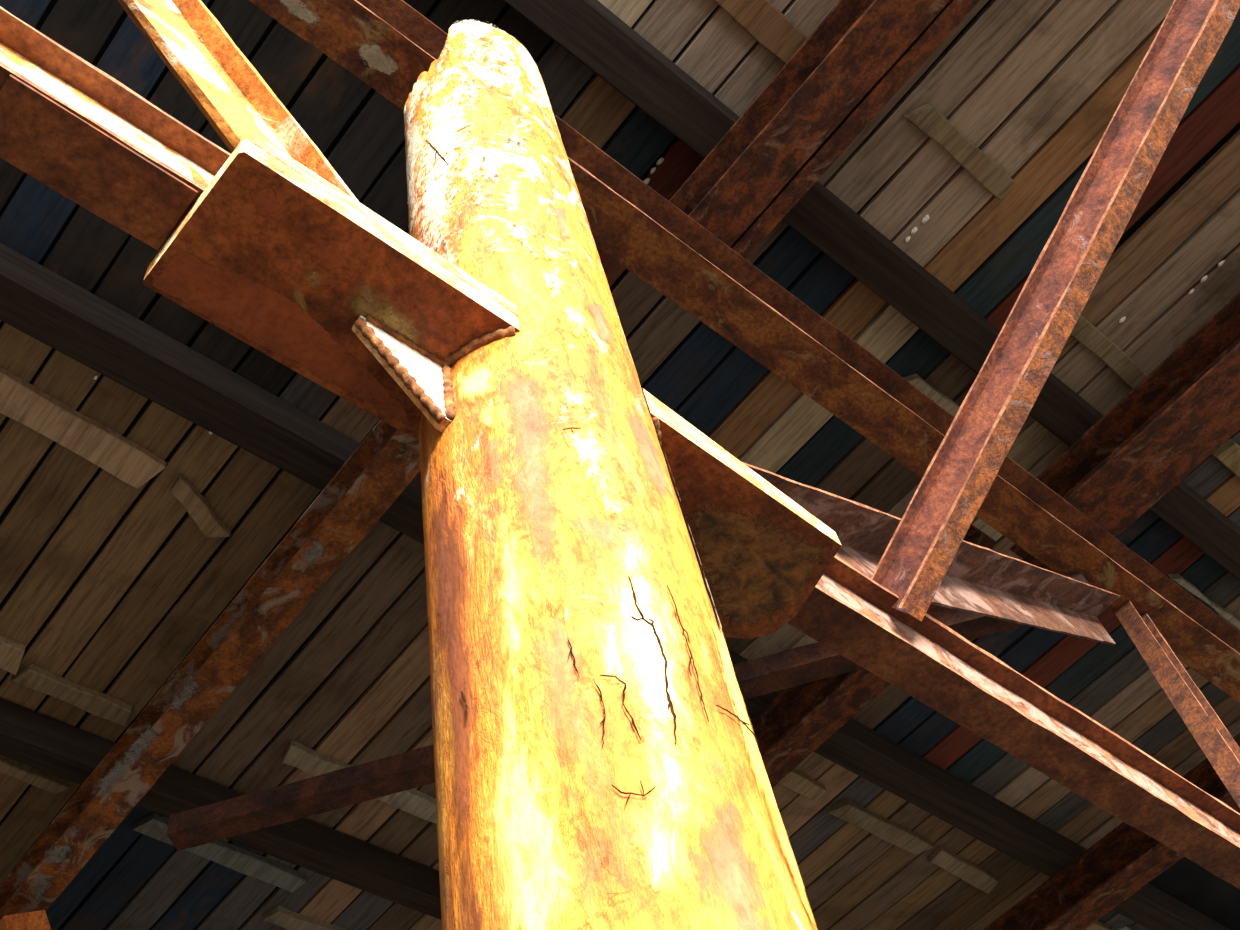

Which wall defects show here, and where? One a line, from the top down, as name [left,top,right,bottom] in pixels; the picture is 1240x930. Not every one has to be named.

peeling [457,20,515,62]
peeling [405,76,591,335]
rust [589,305,612,341]
rust [489,380,554,564]
rust [629,411,668,495]
rust [434,498,475,839]
crack [567,637,642,748]
crack [628,576,759,744]
crack [612,780,656,805]
rust [460,856,483,930]
rust [691,804,764,930]